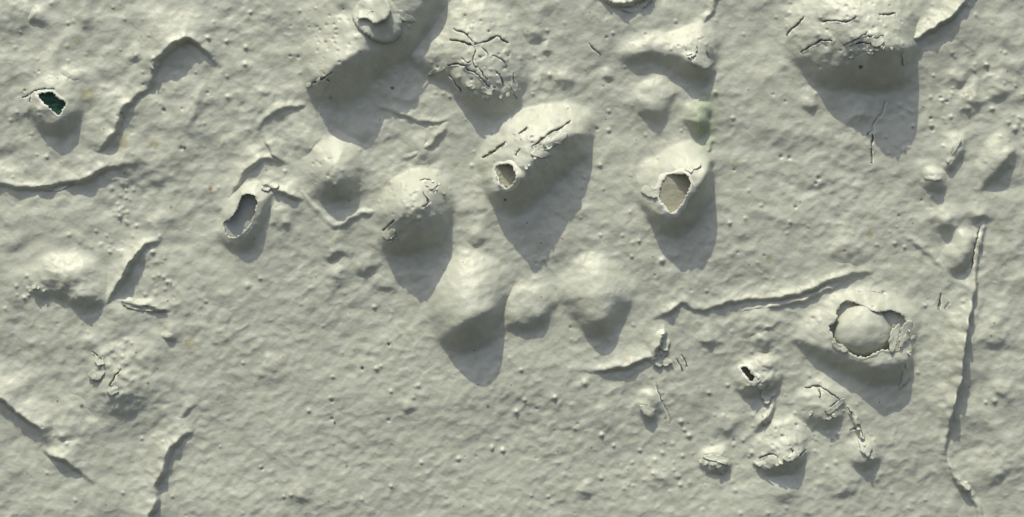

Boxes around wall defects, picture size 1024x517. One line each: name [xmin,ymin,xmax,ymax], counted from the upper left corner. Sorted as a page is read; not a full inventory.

crack [447,27,518,99]
crack [785,11,896,53]
peeling [0,0,236,202]
peeling [216,91,375,235]
crack [482,119,572,160]
crack [969,227,981,268]
peeling [577,260,880,383]
peeling [845,401,873,457]